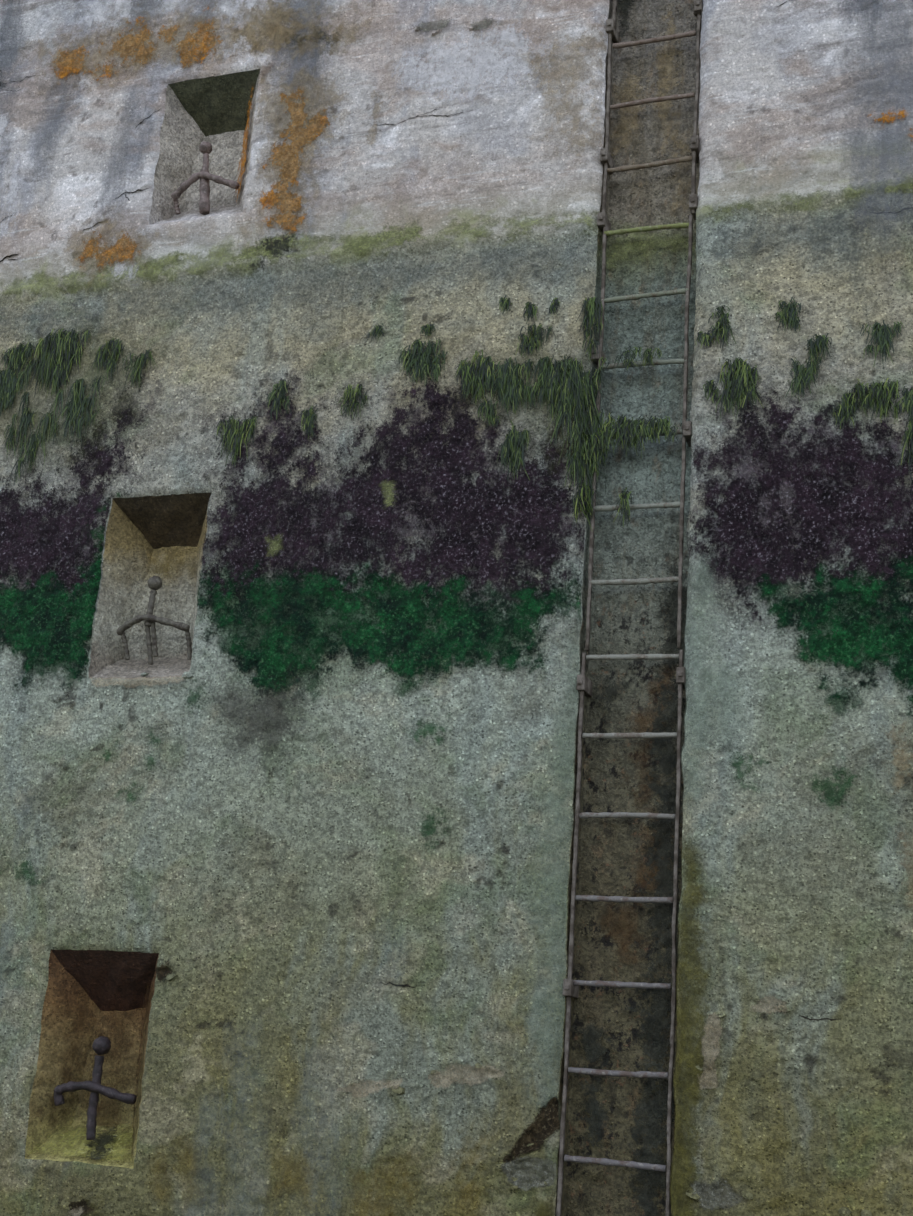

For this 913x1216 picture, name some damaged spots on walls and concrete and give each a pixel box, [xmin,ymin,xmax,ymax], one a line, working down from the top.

spalling [503,1097,560,1163]